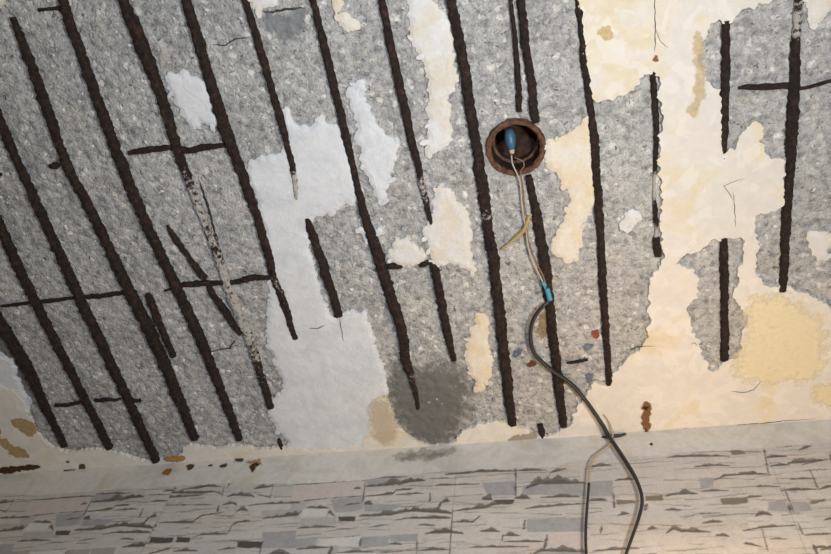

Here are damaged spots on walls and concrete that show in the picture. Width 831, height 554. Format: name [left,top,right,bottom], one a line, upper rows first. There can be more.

crack [654,0,669,49]
spalling [688,0,831,306]
spalling [0,0,664,464]
corrosion [535,313,547,338]
spalling [678,238,748,369]
water stain [386,363,474,444]
corrosion [641,401,652,432]
corrosion [0,464,40,474]
corrosion [162,455,194,475]